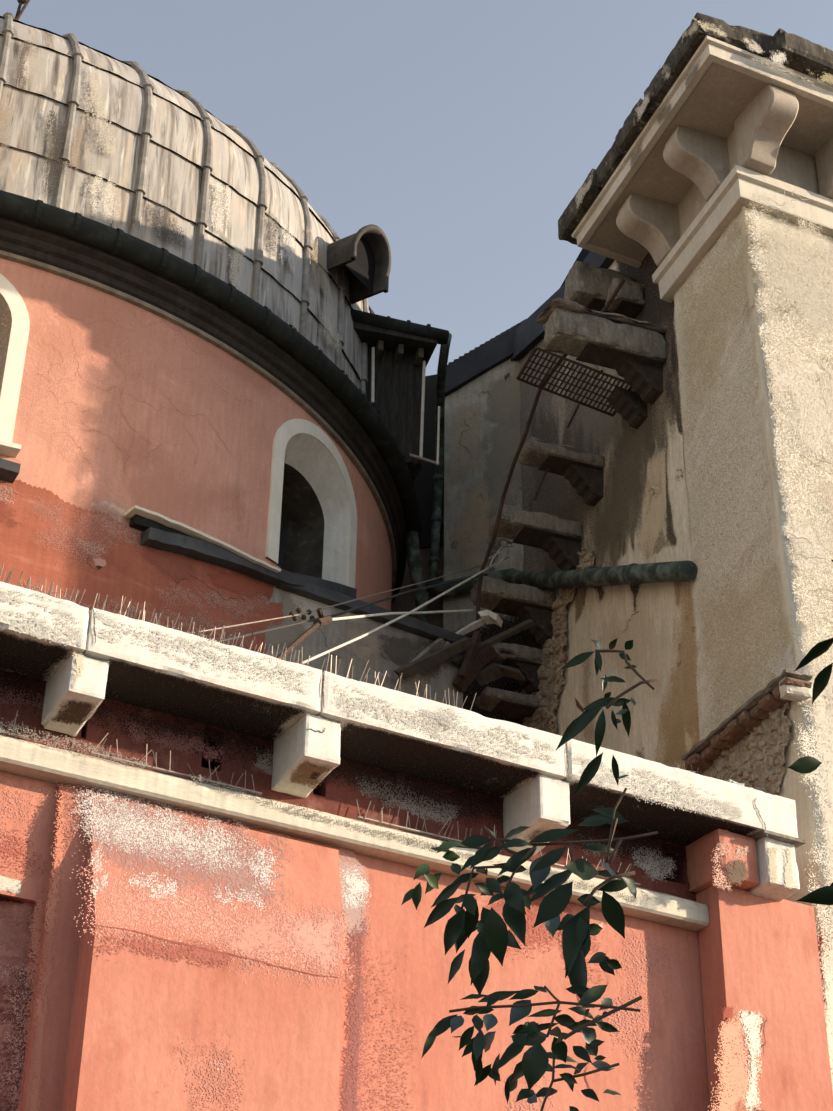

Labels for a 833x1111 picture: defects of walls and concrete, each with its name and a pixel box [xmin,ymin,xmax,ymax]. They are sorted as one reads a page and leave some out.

damp [42,67,121,226]
damp [479,252,683,572]
damp [0,480,315,695]
flaking render [576,548,596,570]
damp [66,782,295,910]
damp [190,774,473,858]
damp [339,849,419,1111]
damp [332,681,558,765]
flaking render [520,588,577,735]
damp [474,869,638,960]
damp [572,582,745,820]
flaking render [695,702,793,796]